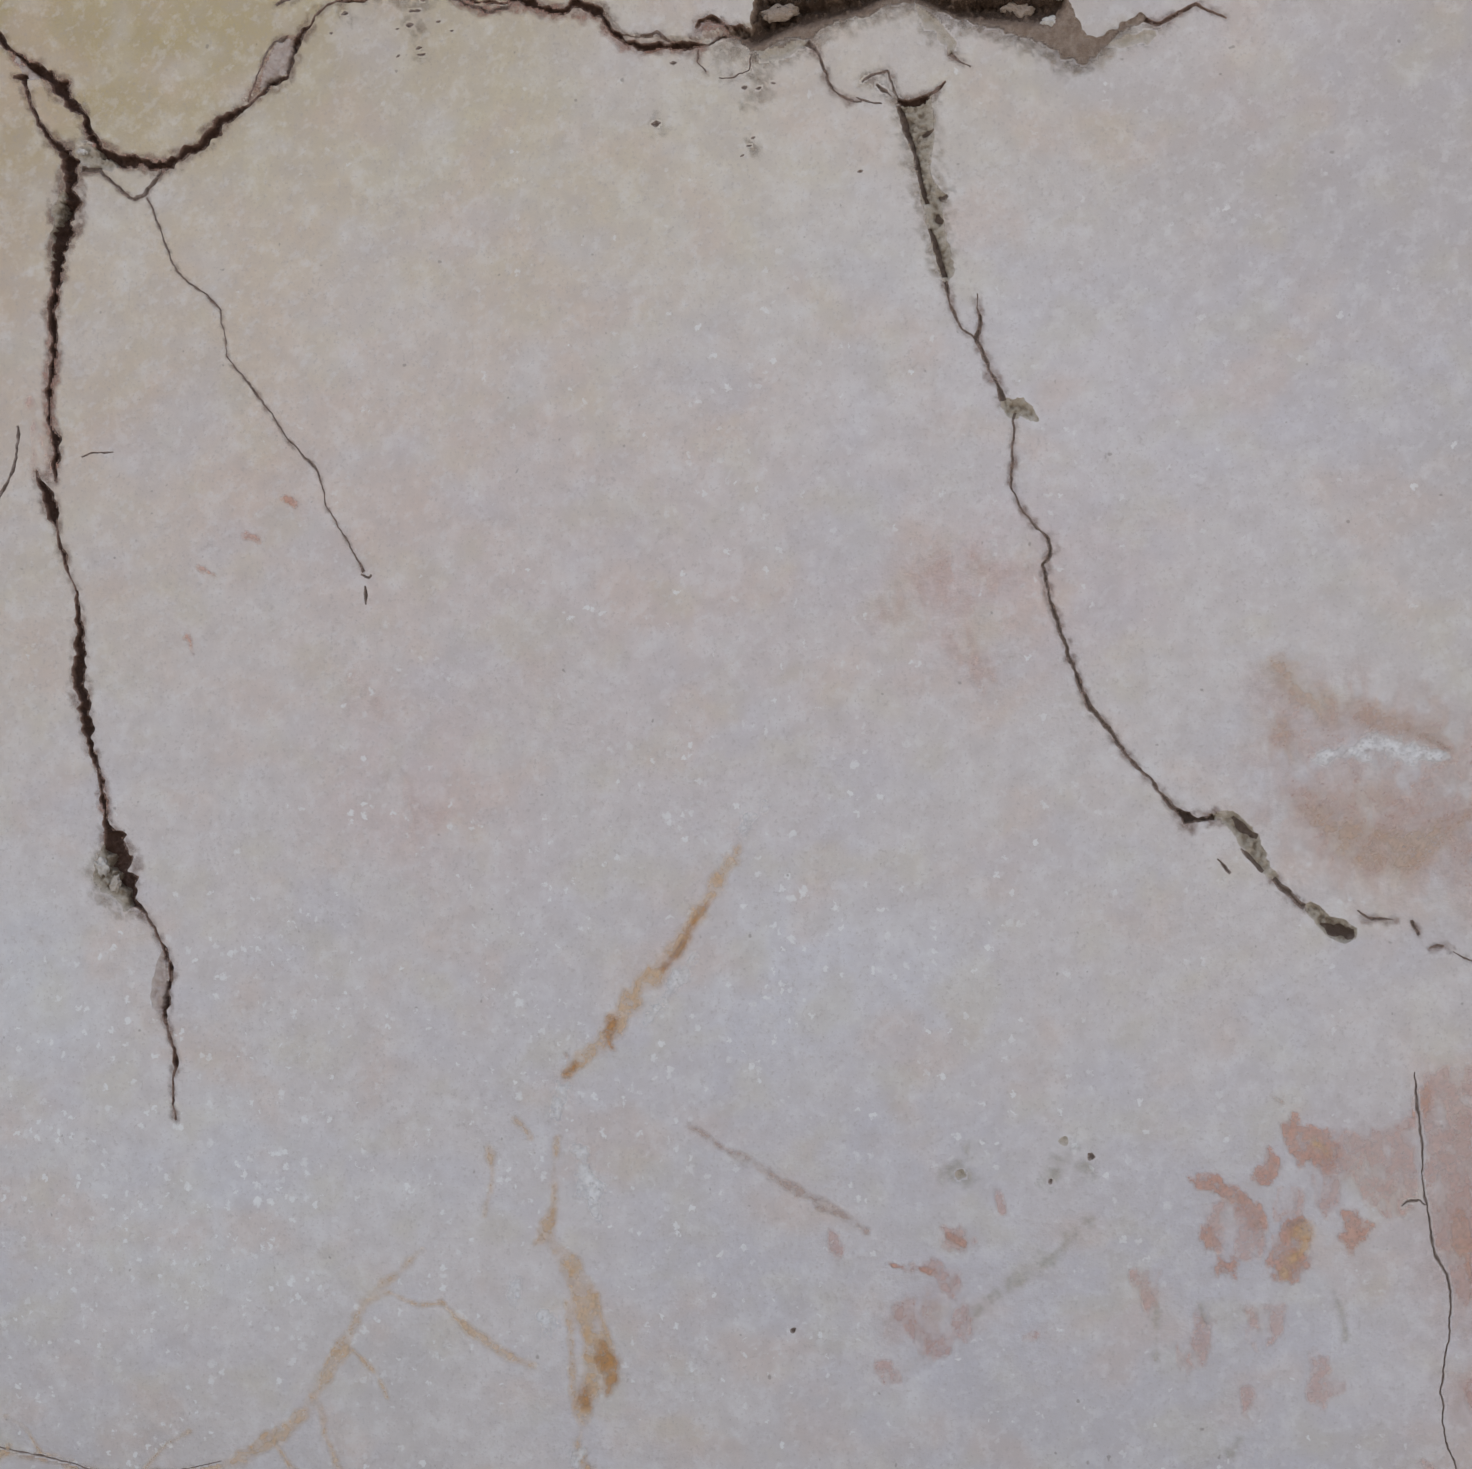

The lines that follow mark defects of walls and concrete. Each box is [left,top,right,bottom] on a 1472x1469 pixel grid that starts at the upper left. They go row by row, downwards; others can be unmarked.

crack [0,0,372,1121]
crack [395,0,1472,962]
rust [551,858,733,1117]
rust [537,1257,617,1415]
crack [1401,1072,1457,1469]